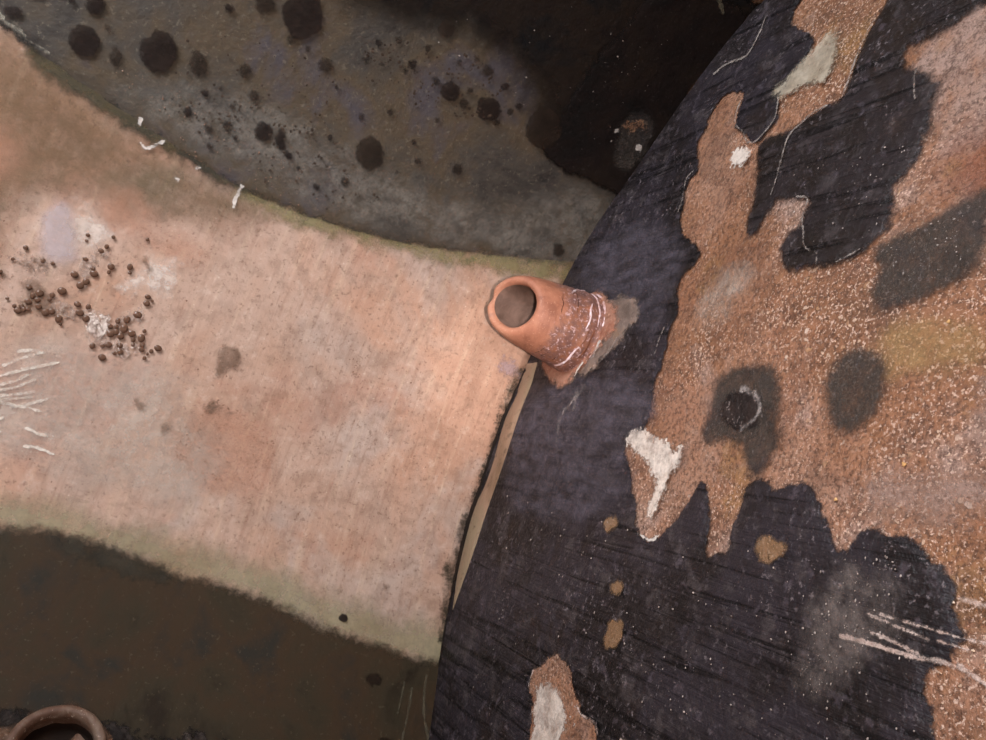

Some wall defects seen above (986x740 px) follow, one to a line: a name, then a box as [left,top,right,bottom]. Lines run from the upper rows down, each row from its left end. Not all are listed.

damp [0,0,676,329]
spalling [615,115,652,170]
damp [31,295,143,359]
rust [542,291,619,387]
damp [0,349,59,411]
damp [512,338,683,518]
flaking render [604,517,618,532]
flaking render [755,535,787,564]
flaking render [610,581,624,595]
damp [0,505,468,740]
flaking render [604,619,623,649]
flaking render [528,654,596,740]